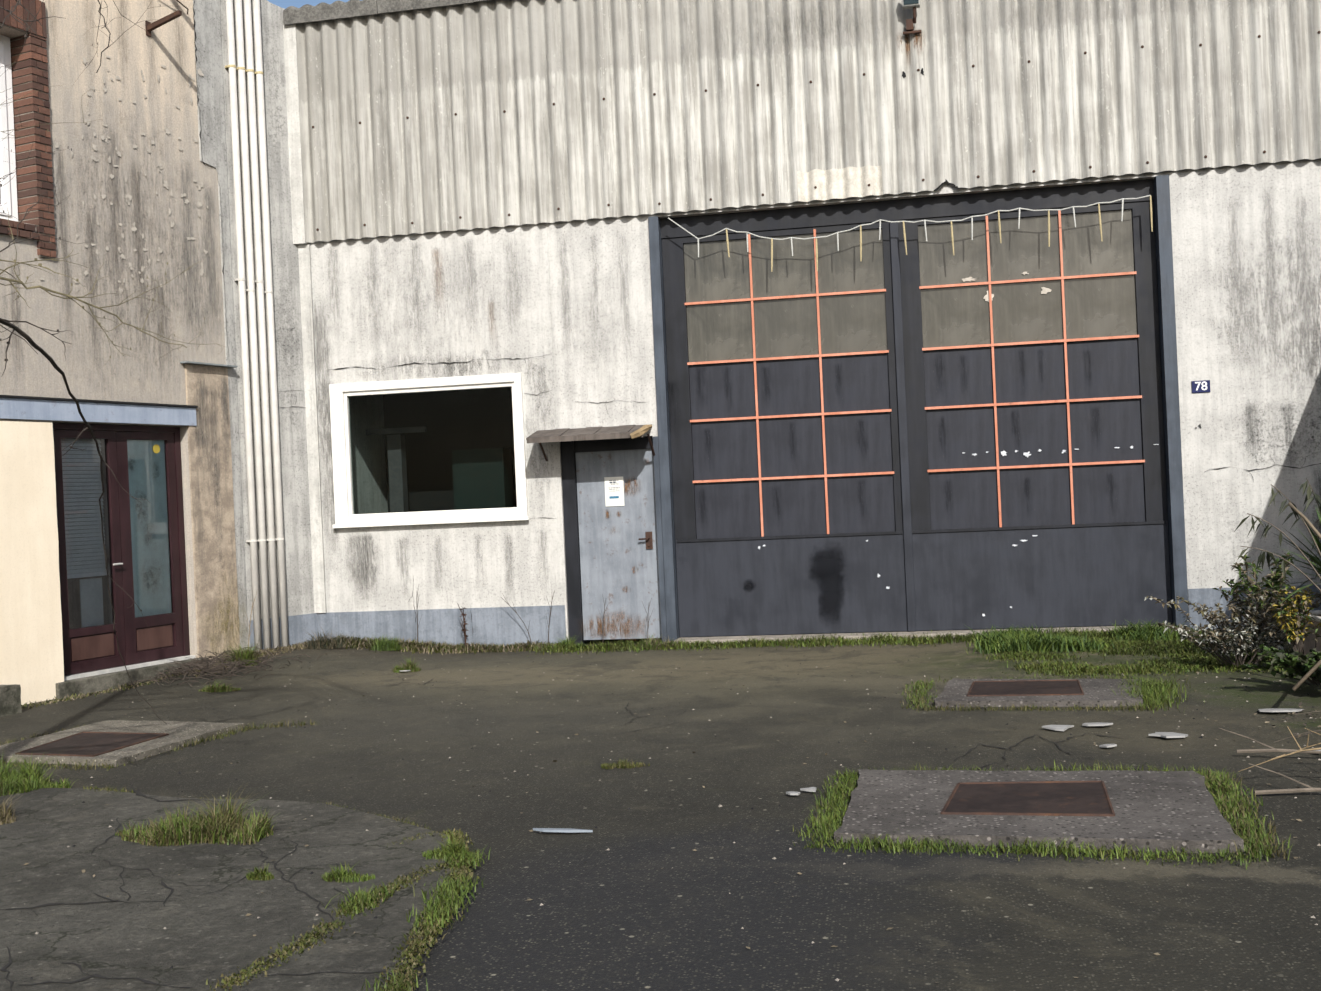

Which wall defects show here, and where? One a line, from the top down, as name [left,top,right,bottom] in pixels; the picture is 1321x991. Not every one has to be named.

water stain [1225,239,1321,371]
crack [953,733,1128,768]
crack [0,783,368,921]
crack [0,947,196,991]